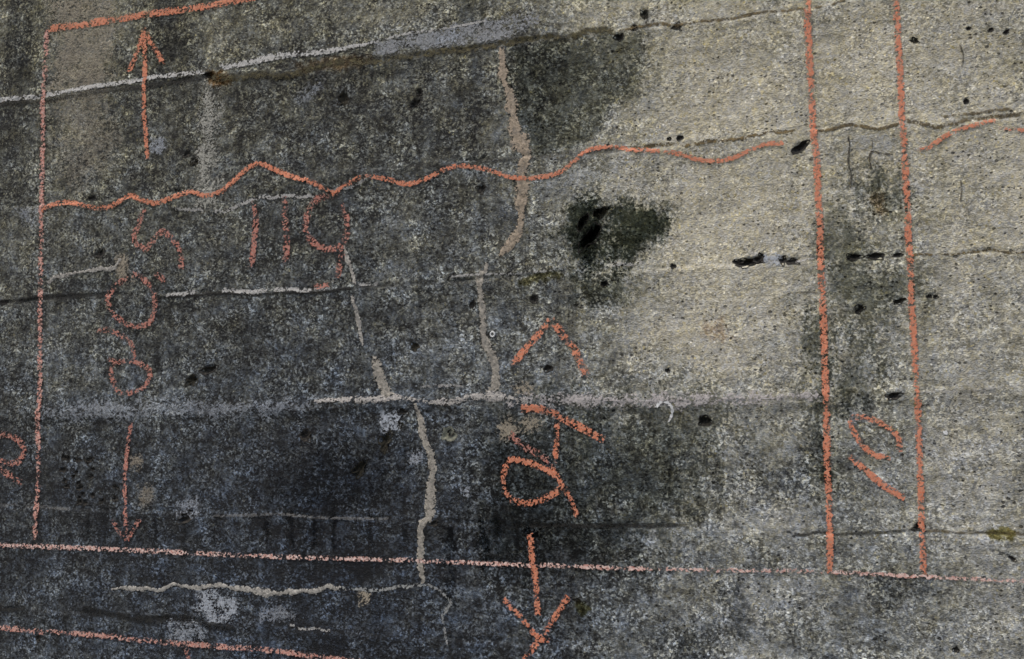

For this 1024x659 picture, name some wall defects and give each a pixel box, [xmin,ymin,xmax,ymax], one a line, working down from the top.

crack [0,0,845,393]
water stain [558,193,671,275]
crack [81,246,452,644]
water stain [314,381,820,440]
efflorescence [169,589,239,641]